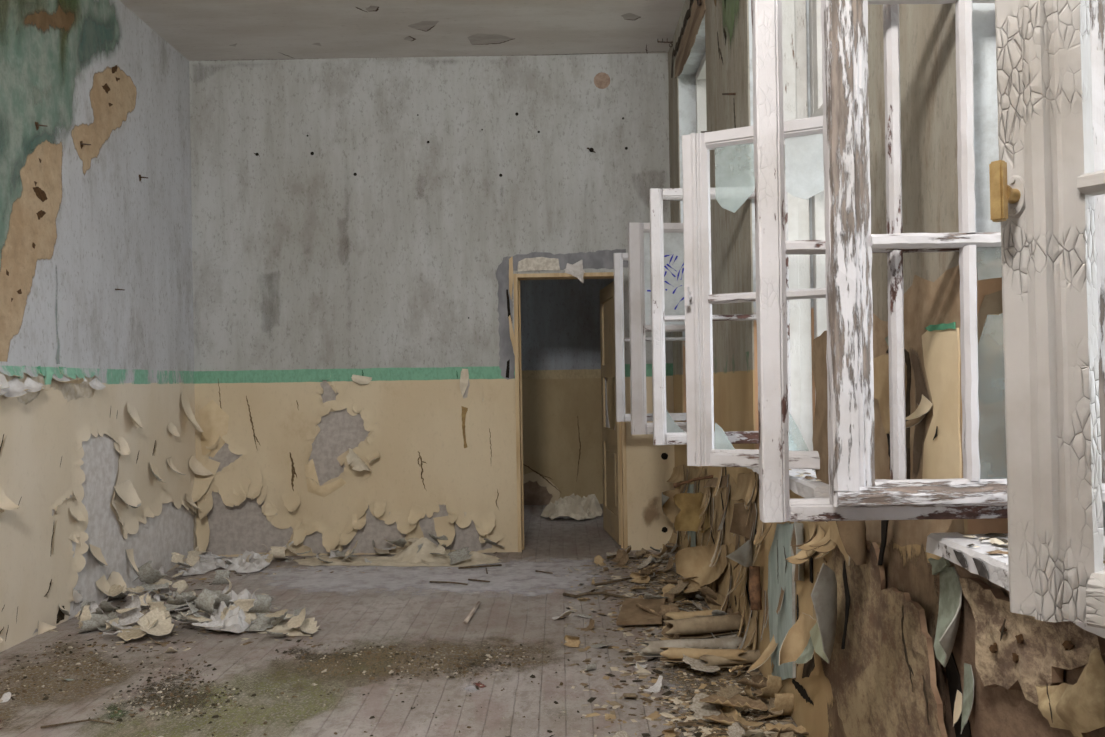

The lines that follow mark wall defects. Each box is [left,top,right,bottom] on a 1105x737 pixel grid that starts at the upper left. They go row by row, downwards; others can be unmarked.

flaking render [468,34,515,45]
leakage [722,0,739,46]
leakage [0,0,120,268]
crack [0,435,9,468]
peeling [0,65,505,635]
peeling [812,331,829,485]
flaking render [873,314,891,480]
crack [0,605,18,642]
crack [44,521,58,598]
peeling [662,464,1105,737]